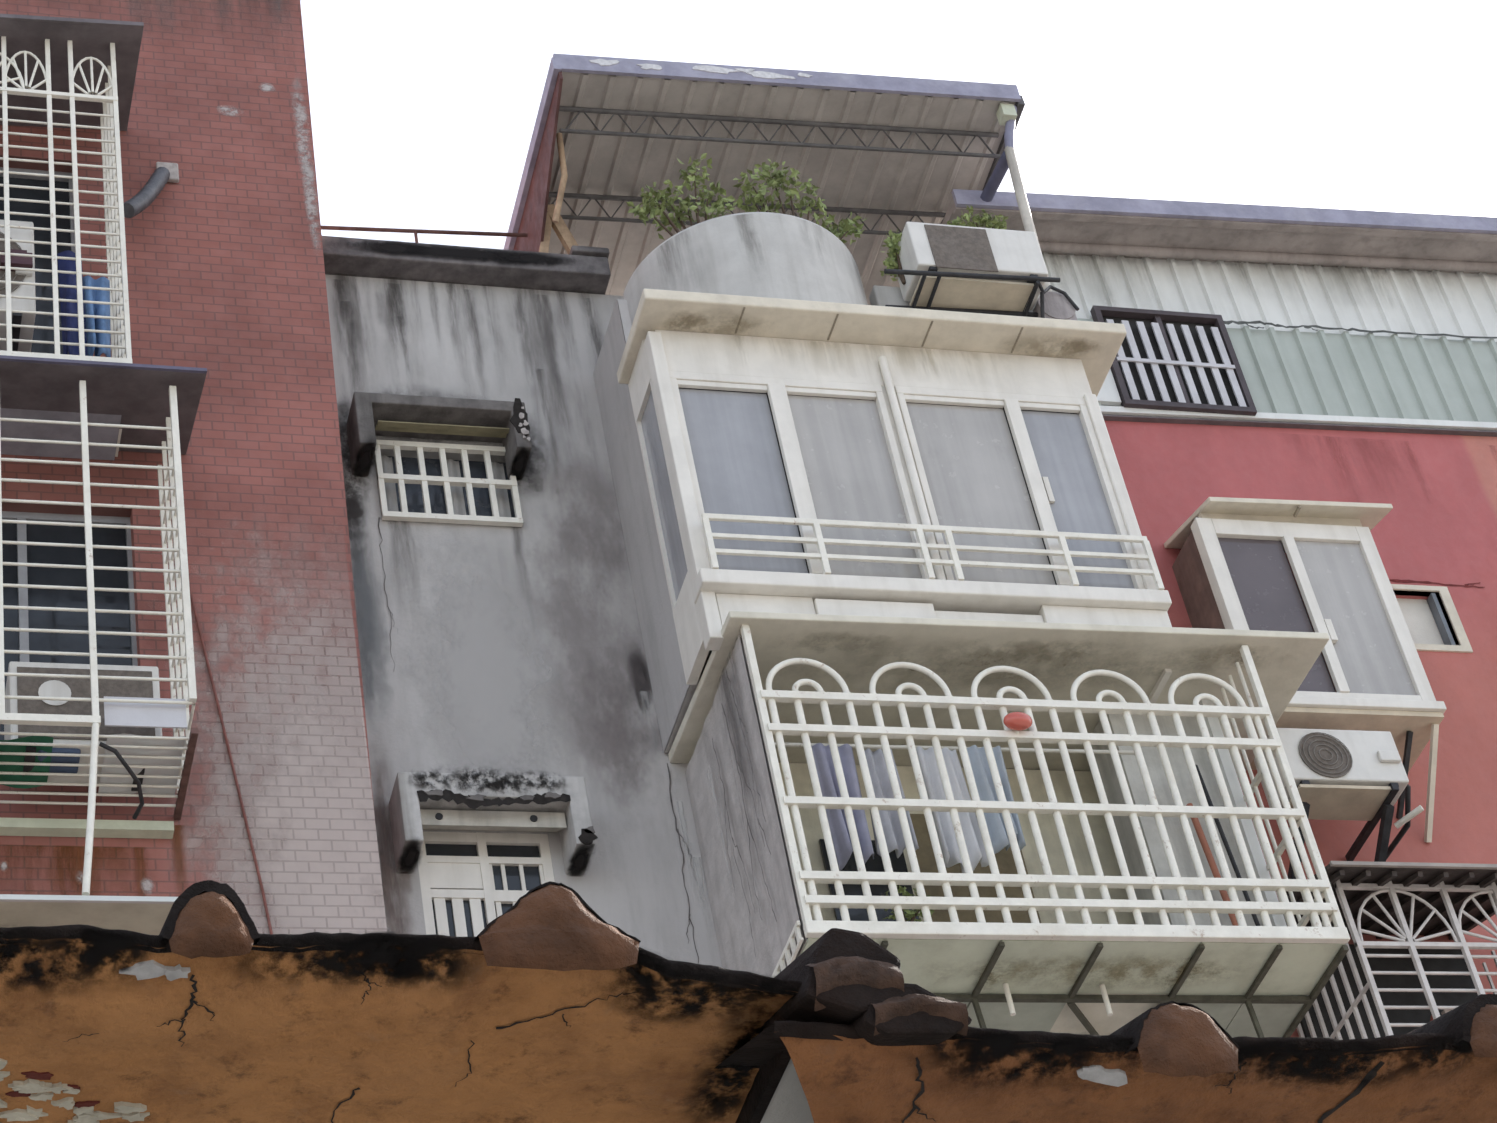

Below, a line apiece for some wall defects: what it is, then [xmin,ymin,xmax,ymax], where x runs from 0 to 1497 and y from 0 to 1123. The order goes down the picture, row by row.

peeling [693,65,812,79]
water stain [339,411,375,536]
water stain [414,771,557,791]
crack [667,670,777,964]
water stain [569,845,593,875]
peeling [119,960,191,981]
crack [157,974,215,1047]
crack [455,992,636,1087]
water stain [624,953,795,1119]
peeling [0,1058,150,1123]
crack [902,1057,936,1123]
peeling [1077,1065,1128,1087]